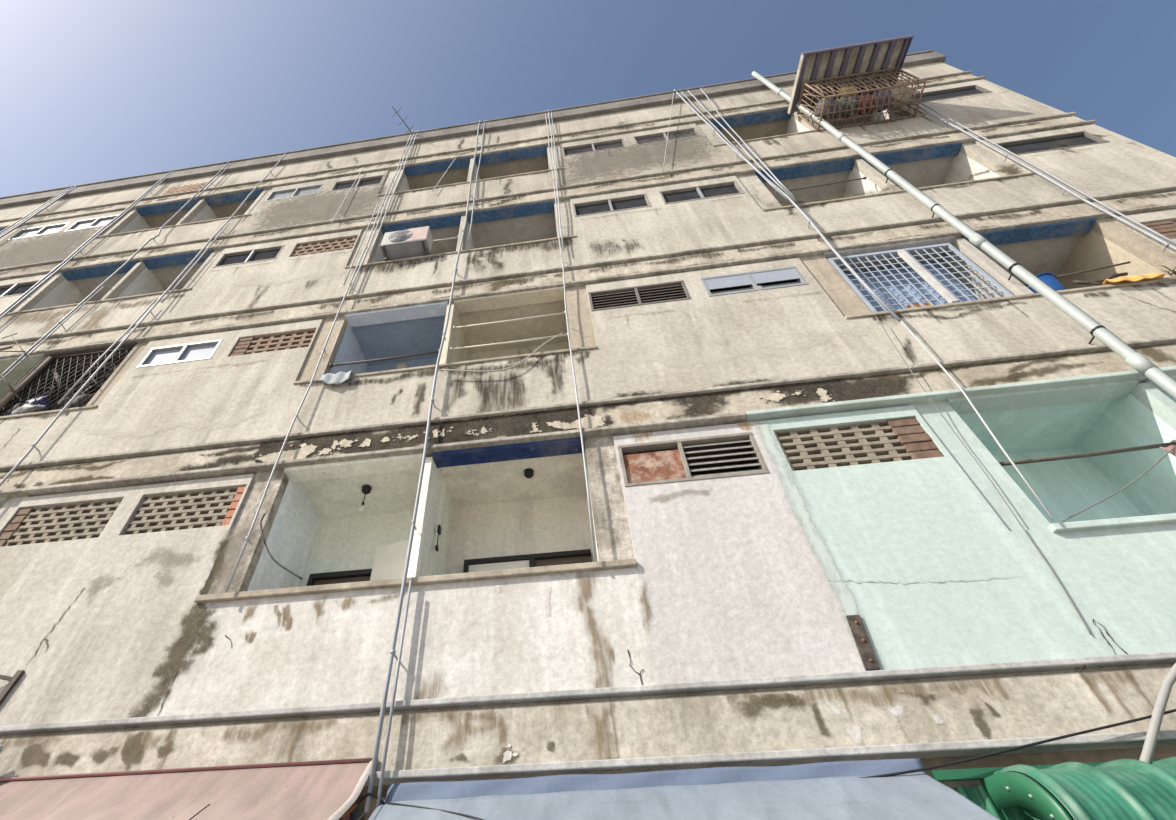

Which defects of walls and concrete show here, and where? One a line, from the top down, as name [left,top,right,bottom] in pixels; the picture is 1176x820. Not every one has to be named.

peeling [255,426,492,463]
leakage [88,352,971,471]
peeling [530,414,606,433]
peeling [759,388,835,403]
crack [25,587,85,666]
leakage [131,522,251,718]
leakage [579,577,615,688]
leakage [441,709,506,746]
leakage [587,706,615,772]
leakage [733,684,924,736]
leakage [1081,671,1150,713]